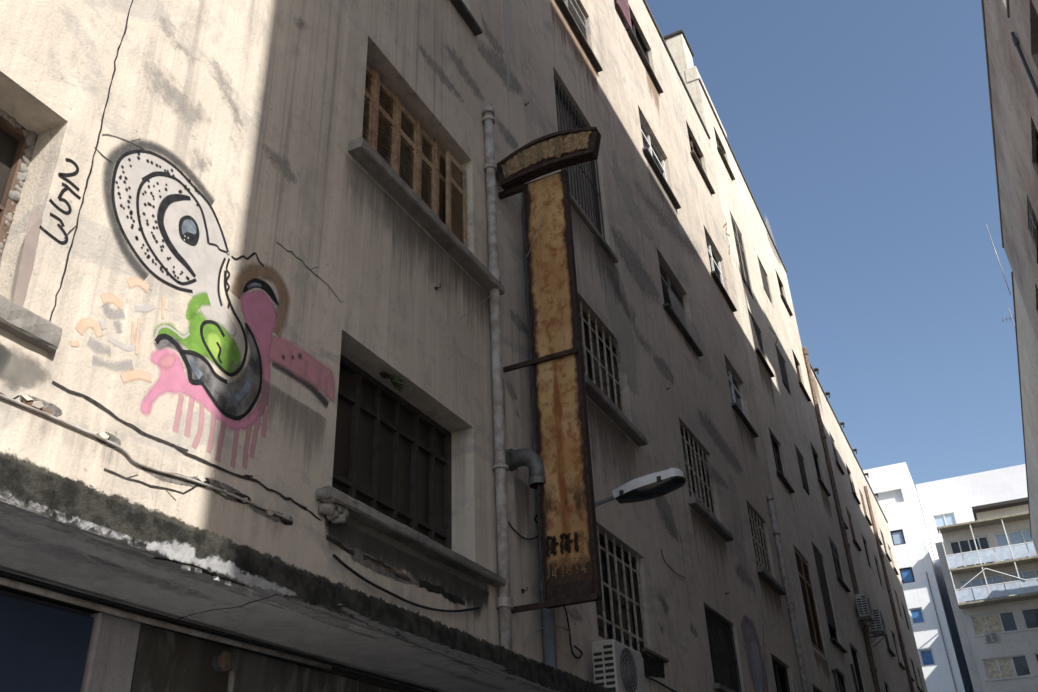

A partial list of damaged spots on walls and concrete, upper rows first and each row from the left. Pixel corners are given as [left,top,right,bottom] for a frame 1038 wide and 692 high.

crack [276,242,342,303]
spalling [138,465,293,525]
water stain [147,540,297,596]
peeling [0,504,506,670]
water stain [327,520,488,614]